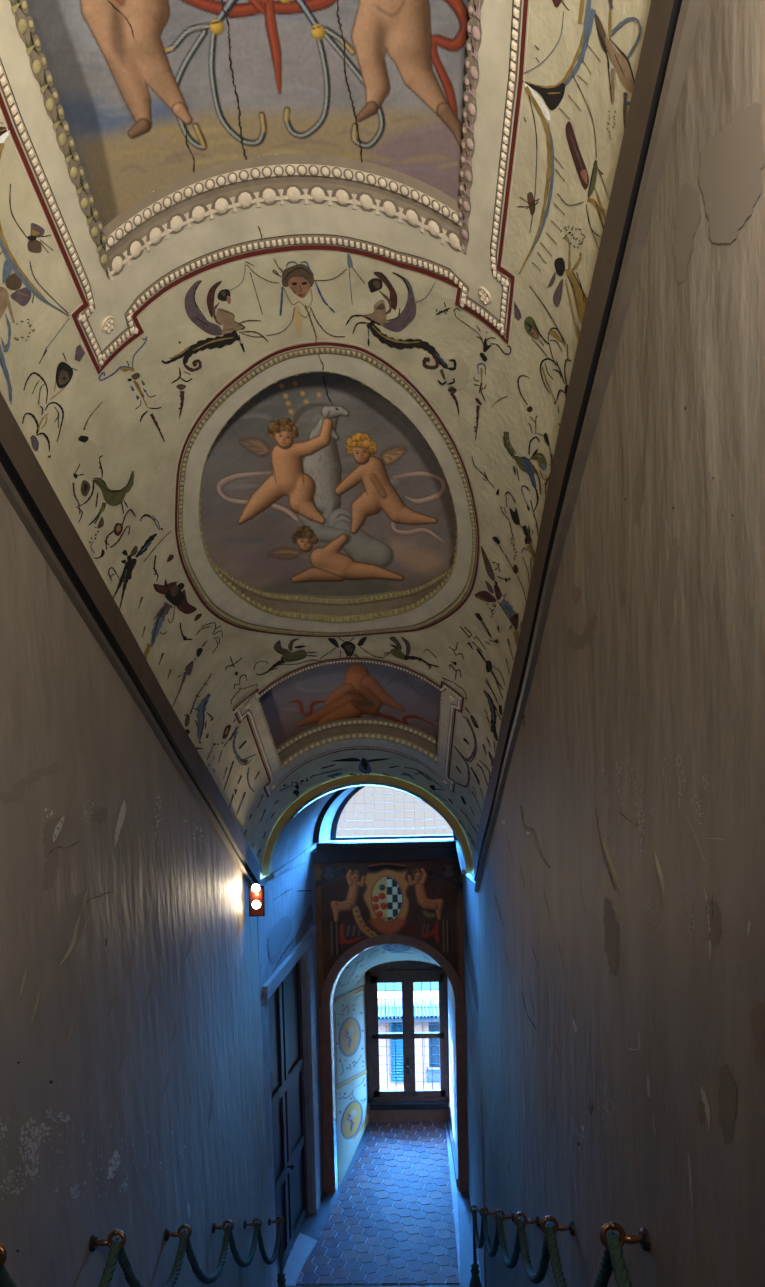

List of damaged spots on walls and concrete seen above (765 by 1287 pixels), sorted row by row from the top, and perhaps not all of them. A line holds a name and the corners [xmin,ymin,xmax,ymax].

leakage [603,897,620,976]